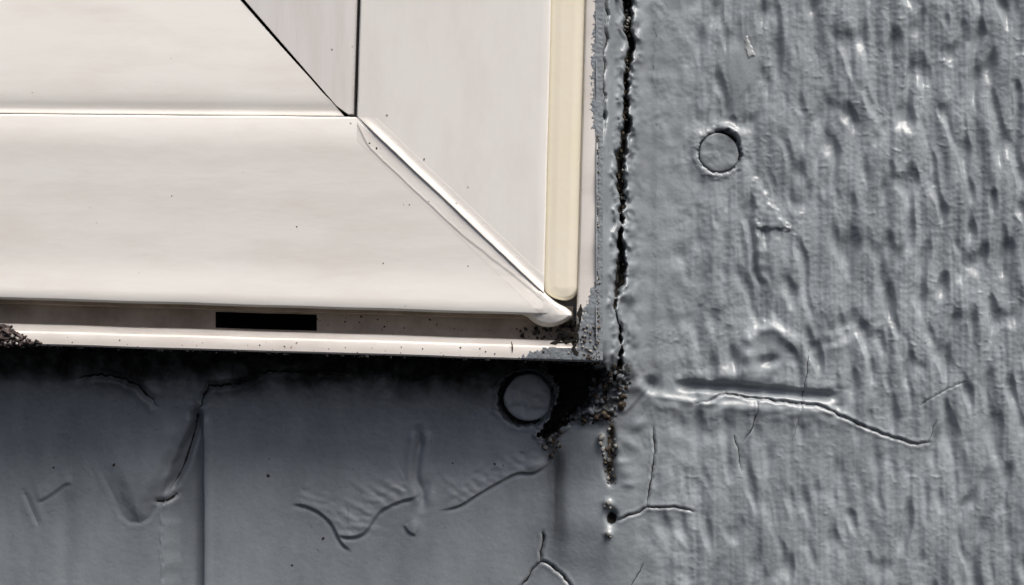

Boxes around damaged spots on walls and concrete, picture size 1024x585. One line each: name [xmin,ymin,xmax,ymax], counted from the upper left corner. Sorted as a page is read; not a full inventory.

crack [603,0,634,371]
crack [78,373,159,407]
crack [598,419,618,484]
crack [619,428,694,520]
crack [697,356,962,471]